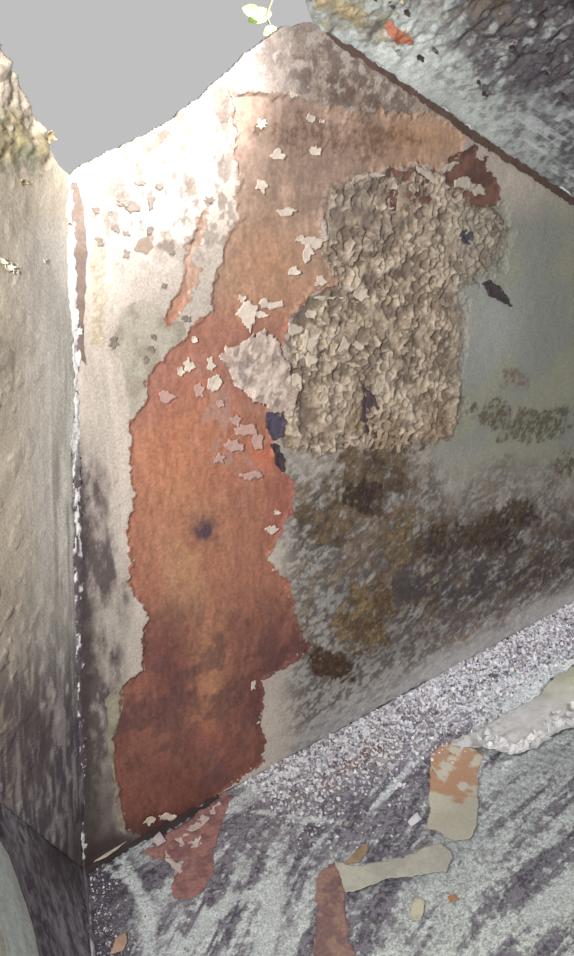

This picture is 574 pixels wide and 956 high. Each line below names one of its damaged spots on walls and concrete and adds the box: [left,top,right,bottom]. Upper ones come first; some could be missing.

leakage [309,0,408,45]
leakage [0,108,50,175]
spalling [482,280,513,307]
leakage [471,398,571,443]
peeling [92,87,504,900]
leakage [294,424,425,548]
leakage [414,499,547,567]
peeling [408,666,574,841]